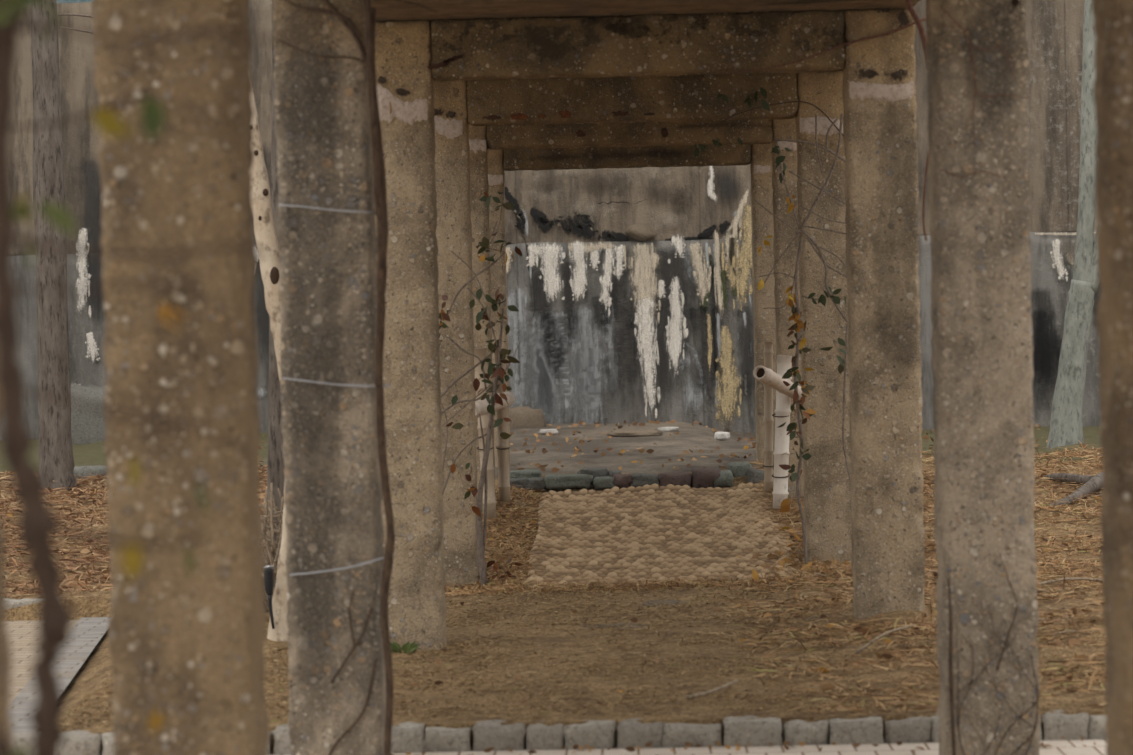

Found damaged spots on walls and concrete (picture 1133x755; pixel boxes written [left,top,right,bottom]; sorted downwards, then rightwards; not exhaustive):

leakage [428,14,714,63]
leakage [724,0,863,52]
leakage [506,151,754,428]